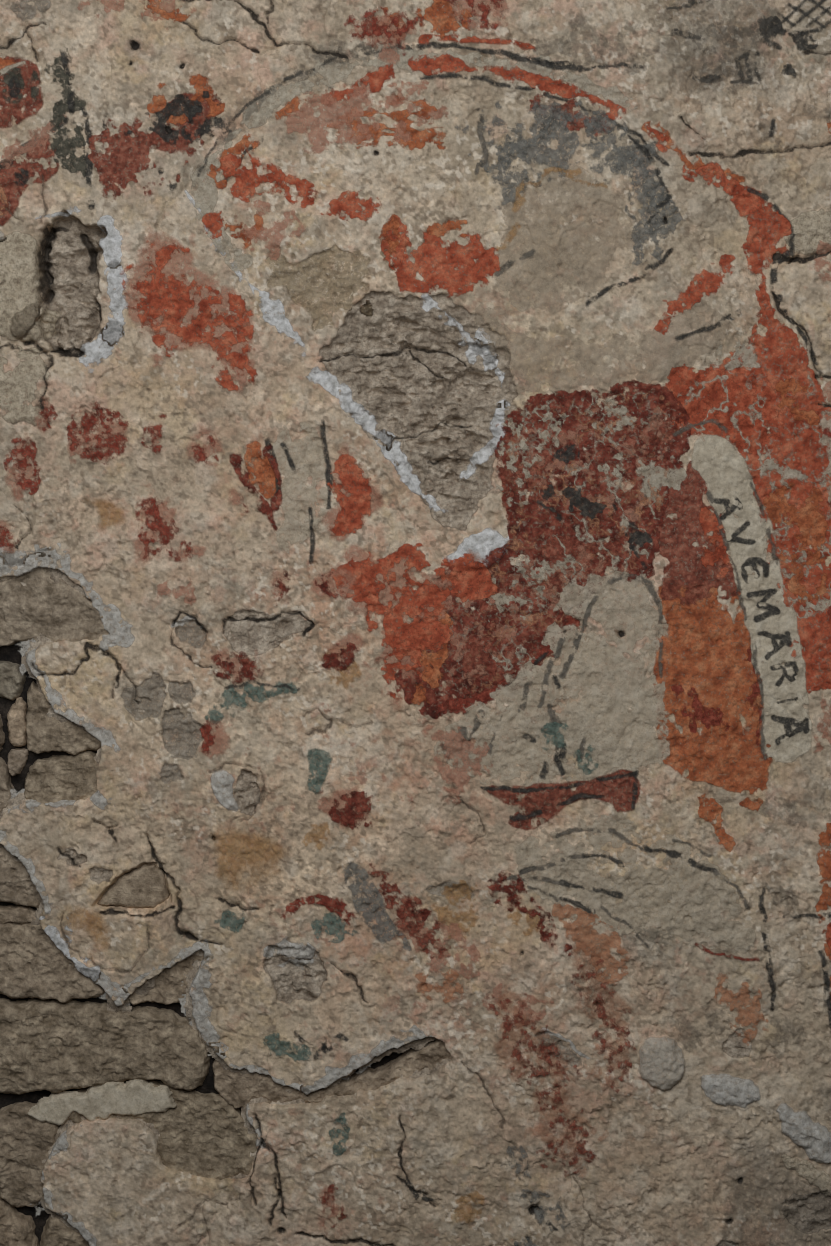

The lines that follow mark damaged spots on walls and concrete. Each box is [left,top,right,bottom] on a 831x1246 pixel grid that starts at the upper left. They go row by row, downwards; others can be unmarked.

crack [0,22,46,61]
crack [183,0,348,59]
spalling [37,190,518,531]
peeling [134,498,205,561]
spalling [0,521,452,1246]
crack [183,1115,394,1246]
crack [397,1115,436,1206]